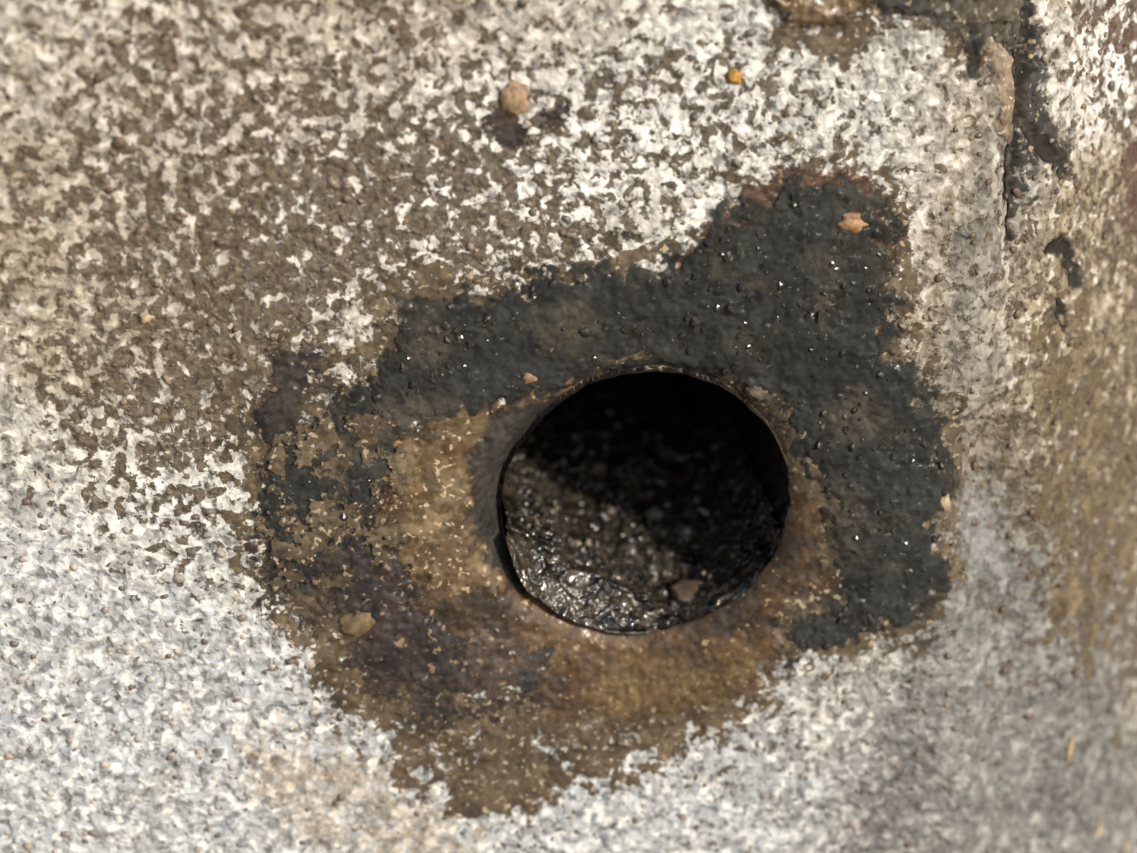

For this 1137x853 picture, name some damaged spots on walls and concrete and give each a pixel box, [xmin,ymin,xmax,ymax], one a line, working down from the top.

leakage [761,0,1044,74]
crack [960,36,985,79]
crack [997,0,1077,241]
leakage [229,133,983,713]